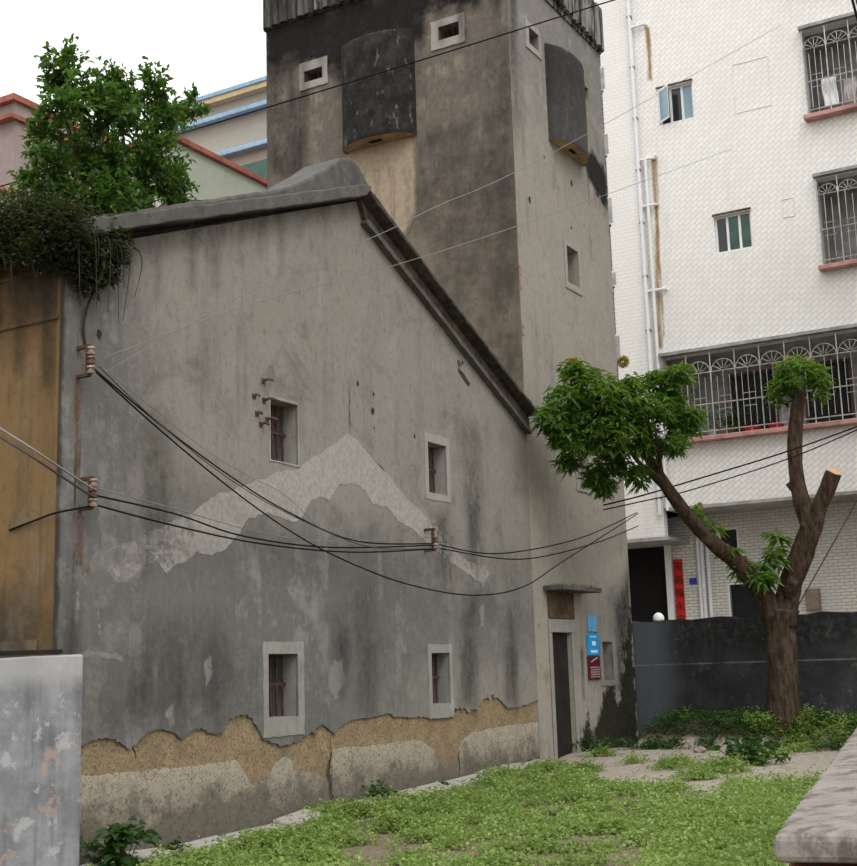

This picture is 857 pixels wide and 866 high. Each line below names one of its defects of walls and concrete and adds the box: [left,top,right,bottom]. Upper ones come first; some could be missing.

flaking render [81,695,537,806]
leakage [580,586,638,752]